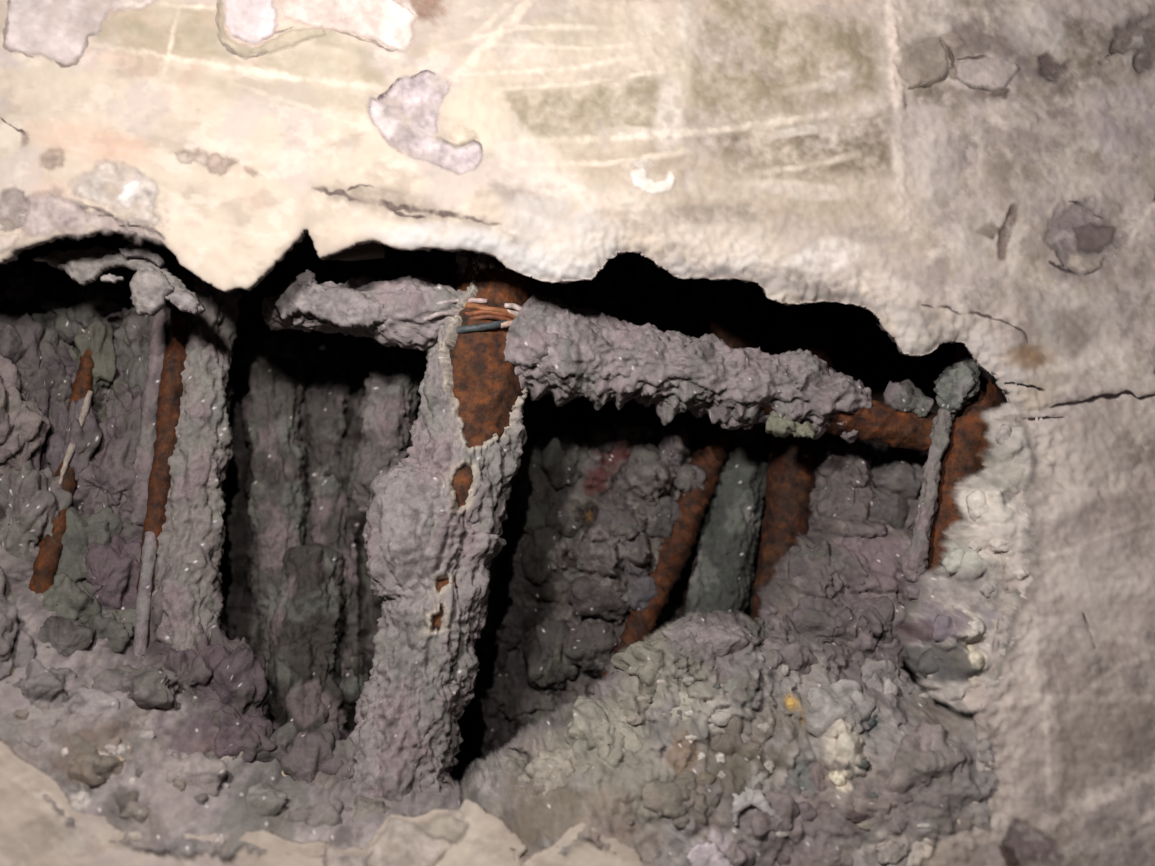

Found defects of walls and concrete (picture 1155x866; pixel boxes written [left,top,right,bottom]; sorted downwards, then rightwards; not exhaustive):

peeling [3,0,153,67]
peeling [216,0,416,58]
peeling [900,34,1019,98]
spalling [1038,53,1067,81]
spalling [369,70,482,174]
spalling [177,149,237,174]
crack [318,185,494,224]
spalling [1045,201,1122,274]
crack [978,368,1155,421]
spalling [0,160,1034,866]
rust [757,437,928,668]
spalling [1000,820,1058,865]